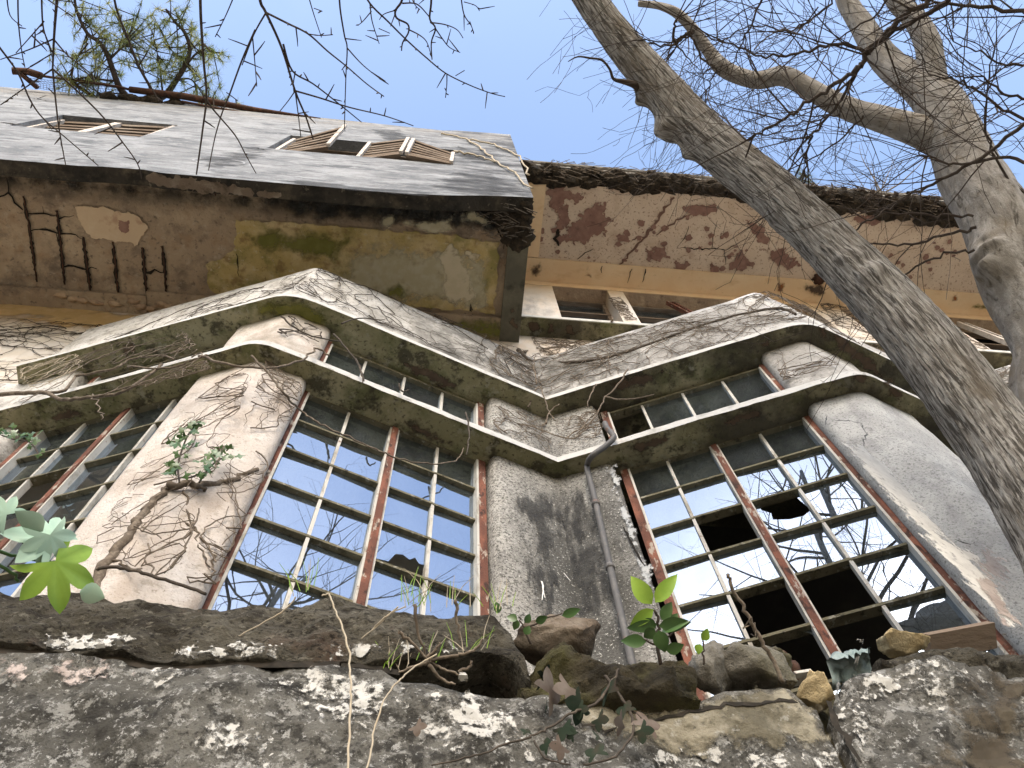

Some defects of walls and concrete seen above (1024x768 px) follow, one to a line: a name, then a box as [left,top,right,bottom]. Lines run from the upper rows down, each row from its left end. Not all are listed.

crack [0,178,97,270]
spalling [53,210,174,312]
spalling [473,187,729,270]
crack [553,197,745,283]
water stain [516,490,613,616]